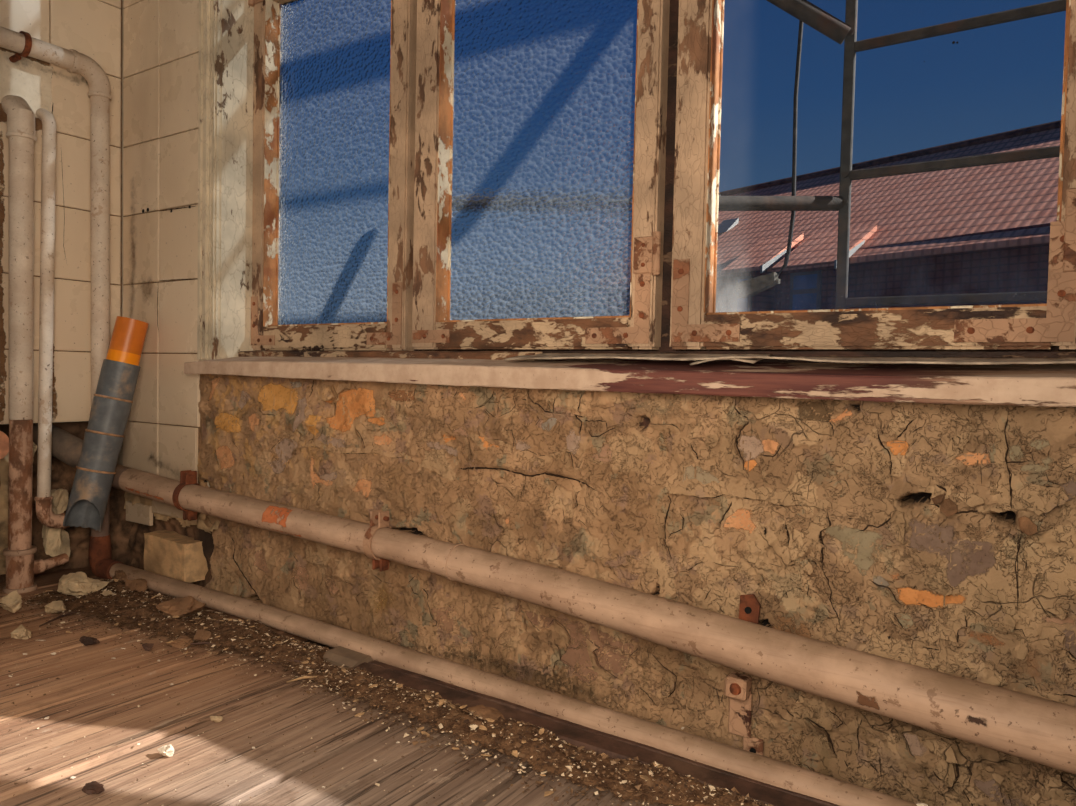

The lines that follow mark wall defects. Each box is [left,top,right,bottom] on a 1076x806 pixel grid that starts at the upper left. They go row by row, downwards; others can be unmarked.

peeling [305,384,392,445]
peeling [738,435,779,471]
crack [650,399,896,627]
spalling [901,492,932,503]
crack [862,409,1075,514]
peeling [951,440,1076,527]
crack [868,580,967,660]
crack [1012,535,1029,661]
crack [786,699,882,779]
peeling [894,732,958,787]
peeling [967,715,987,726]
crack [1039,775,1076,801]